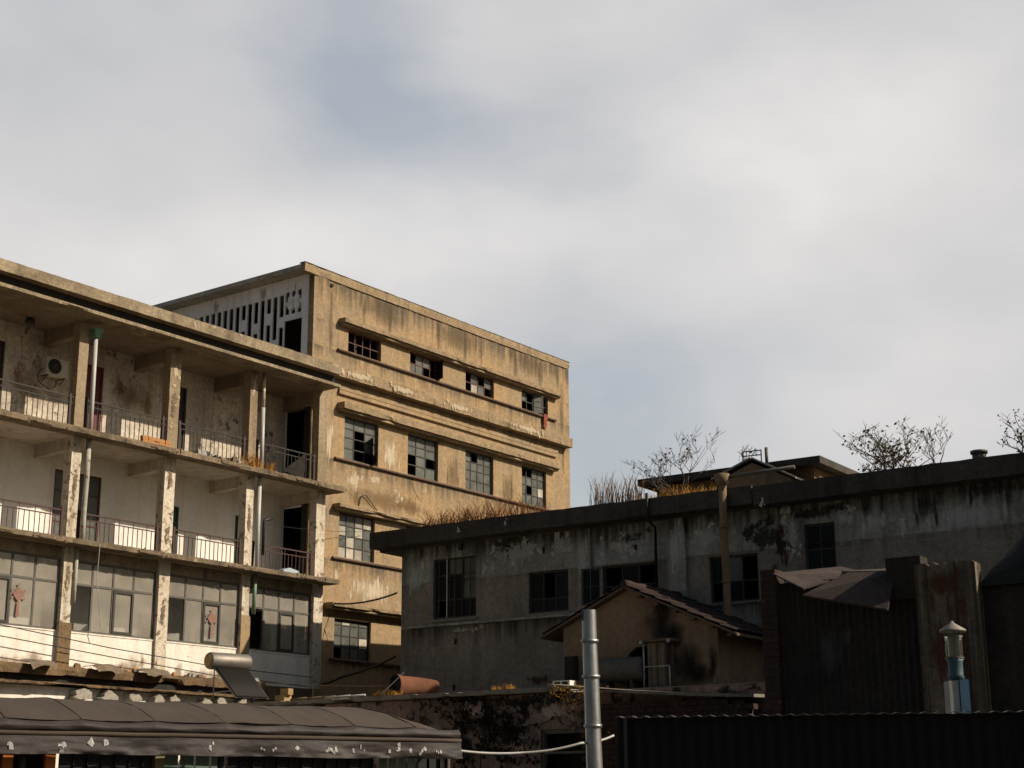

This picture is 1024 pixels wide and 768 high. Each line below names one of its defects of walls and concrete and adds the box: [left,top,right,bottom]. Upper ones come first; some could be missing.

flaking render [482,531,573,574]
leakage [742,514,792,555]
spalling [780,506,802,561]
leakage [862,481,1024,538]